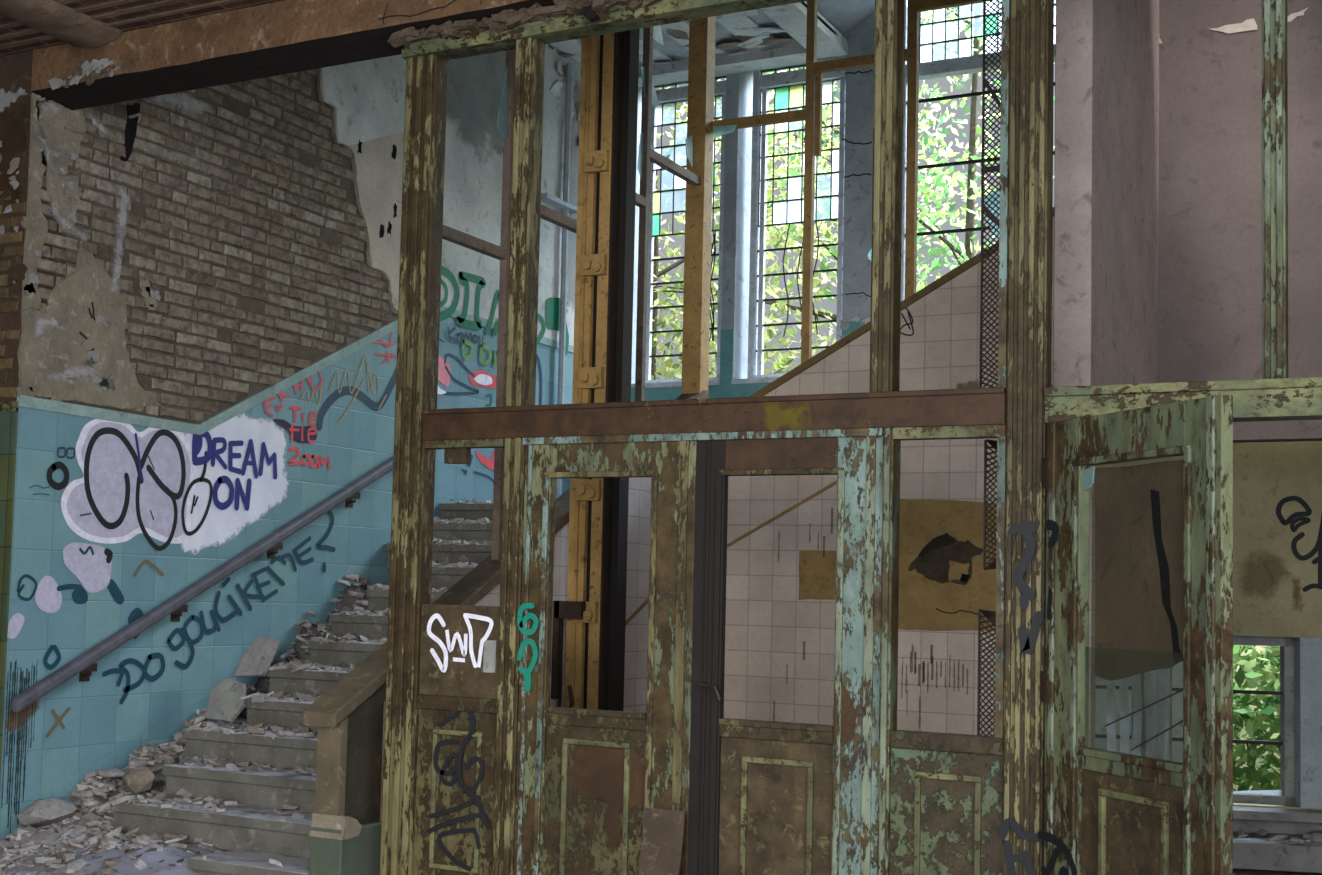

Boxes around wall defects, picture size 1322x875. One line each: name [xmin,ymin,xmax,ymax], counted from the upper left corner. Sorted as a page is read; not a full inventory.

peeling [639,29,689,71]
peeling [715,9,797,56]
spalling [0,0,662,422]
rust [573,745,645,851]